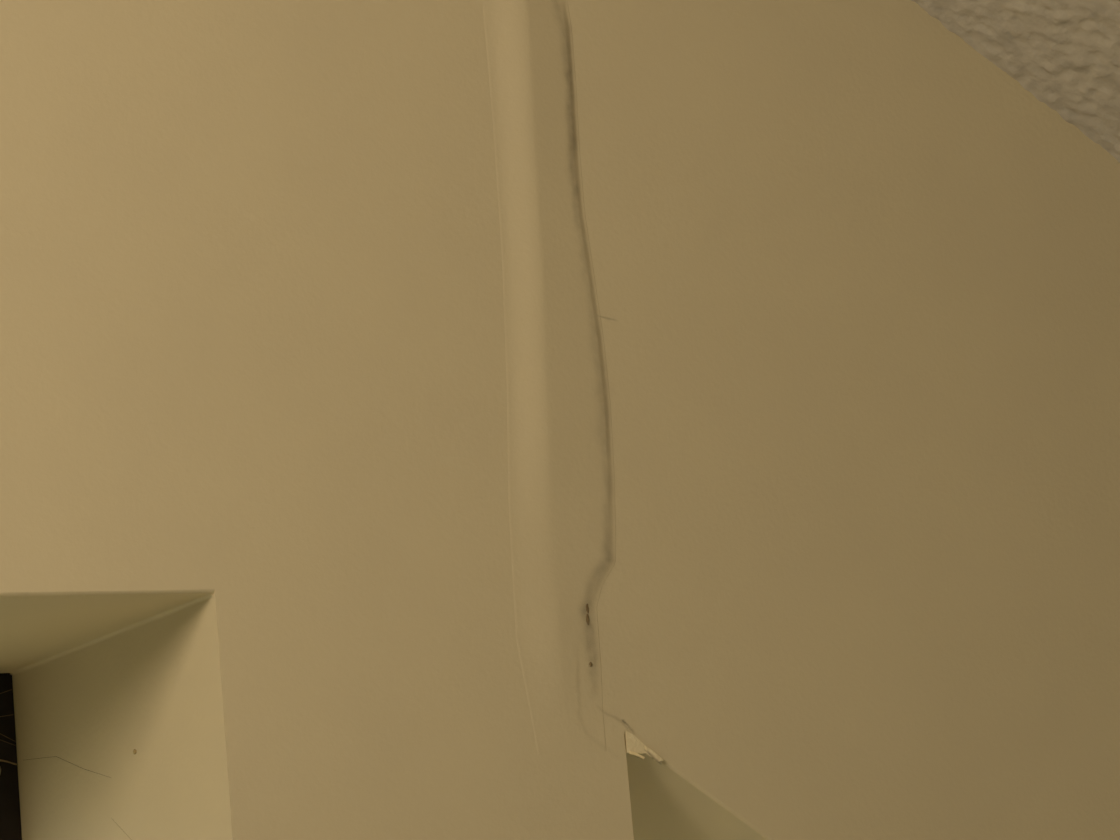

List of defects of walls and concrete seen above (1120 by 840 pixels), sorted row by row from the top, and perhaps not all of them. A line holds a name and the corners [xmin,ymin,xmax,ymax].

crack [584,604,592,625]